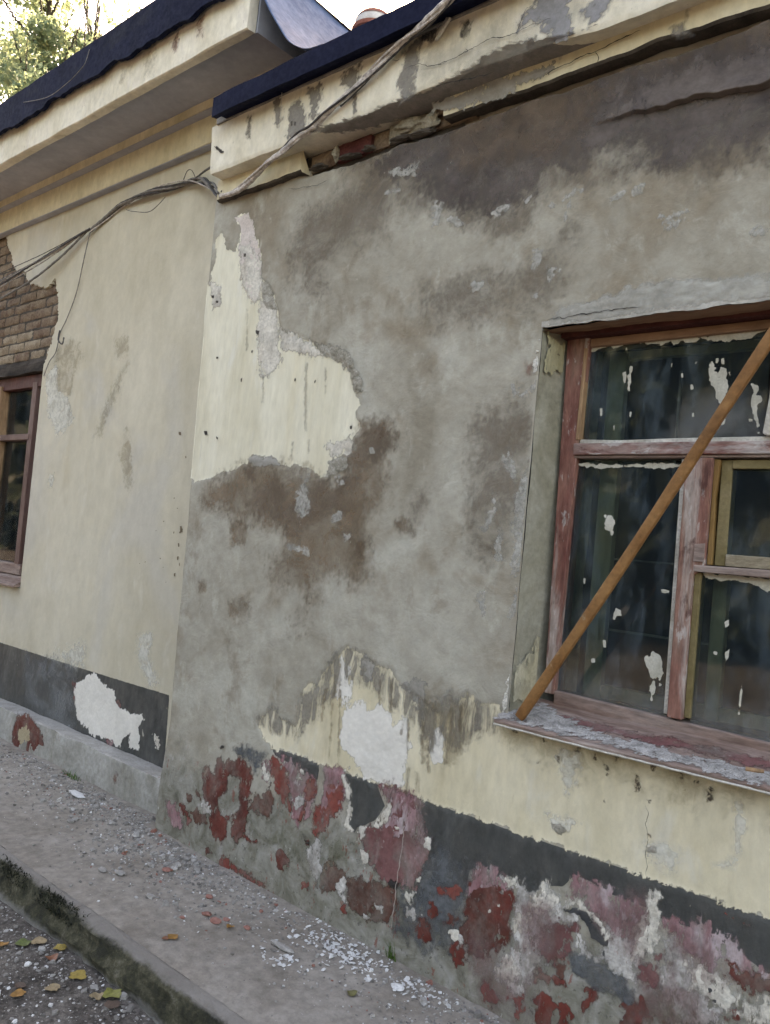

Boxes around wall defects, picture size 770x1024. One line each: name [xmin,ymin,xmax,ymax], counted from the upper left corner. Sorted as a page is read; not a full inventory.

spalling [307,60,556,176]
water stain [273,0,610,139]
crack [395,11,550,88]
water stain [289,19,770,285]
crack [542,30,639,77]
spalling [0,237,59,365]
peeling [185,212,363,482]
peeling [528,324,565,375]
water stain [202,420,390,604]
peeling [1,713,44,797]
peeling [72,672,160,751]
peeling [137,636,770,1024]